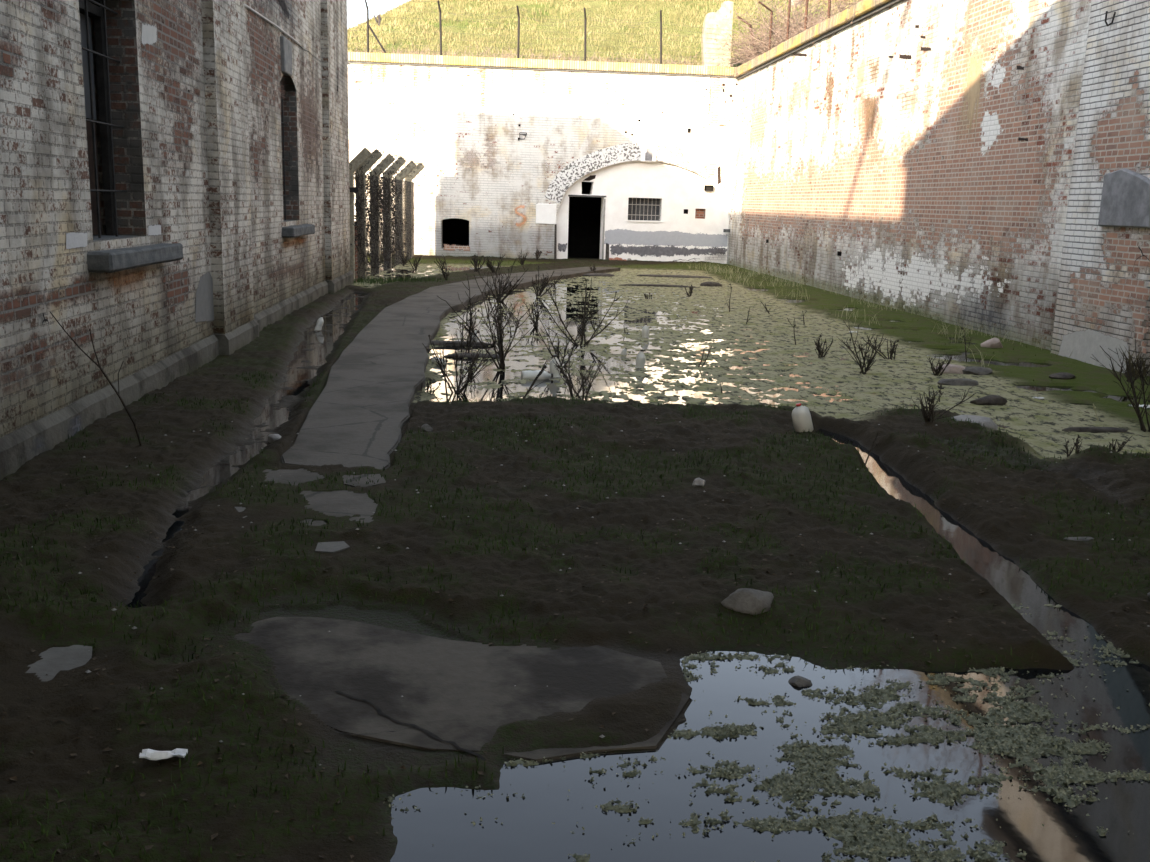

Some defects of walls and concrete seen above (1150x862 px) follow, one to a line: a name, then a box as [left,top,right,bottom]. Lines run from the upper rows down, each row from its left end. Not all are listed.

flaking render [0,32,23,77]
flaking render [134,0,201,175]
flaking render [604,0,1067,268]
flaking render [1090,70,1150,181]
flaking render [0,274,98,391]
flaking render [162,258,190,313]
flaking render [1070,227,1150,354]